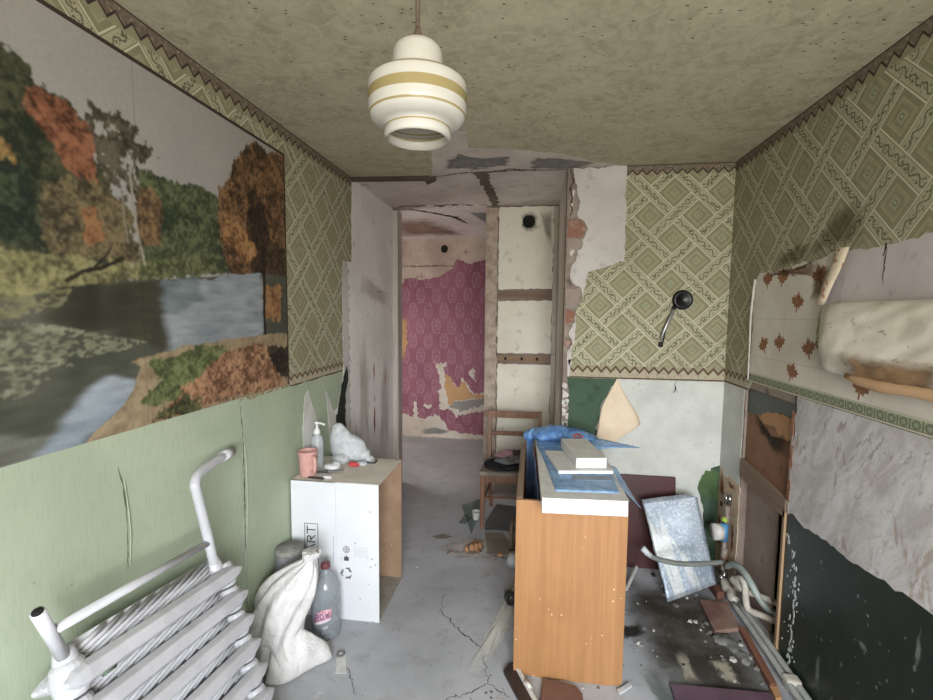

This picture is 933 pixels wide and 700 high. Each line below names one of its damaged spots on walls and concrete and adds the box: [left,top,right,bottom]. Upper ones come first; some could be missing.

flaking render [562,166,627,427]
flaking render [821,232,933,311]
crack [118,468,131,565]
crack [240,405,248,549]
peeling [759,397,933,615]
crack [440,594,508,700]
spalling [781,533,800,665]